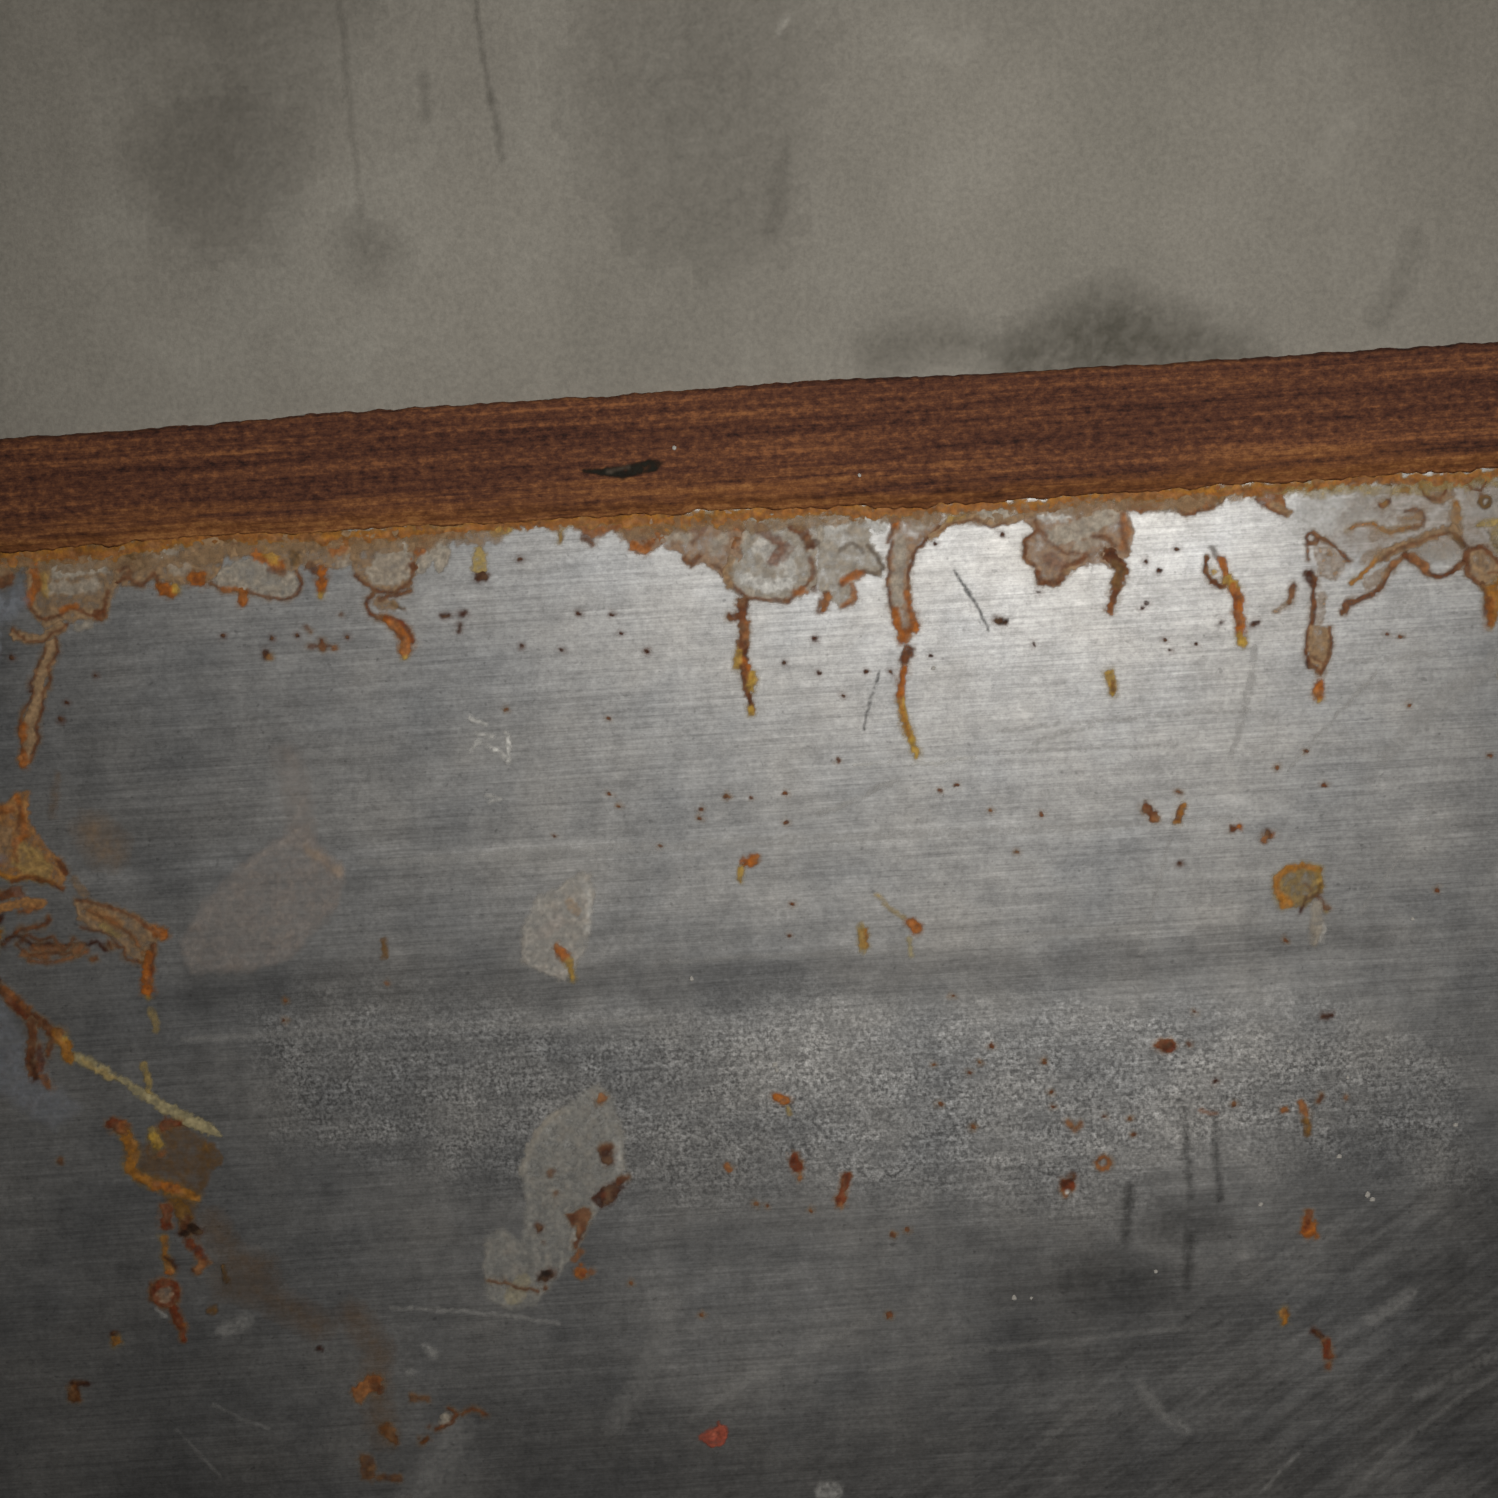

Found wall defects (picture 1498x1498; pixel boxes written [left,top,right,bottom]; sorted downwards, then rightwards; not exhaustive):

rust [0,468,1498,768]
rust [0,791,168,998]
rust [1273,862,1331,945]
rust [0,980,74,1089]
rust [105,1117,229,1343]